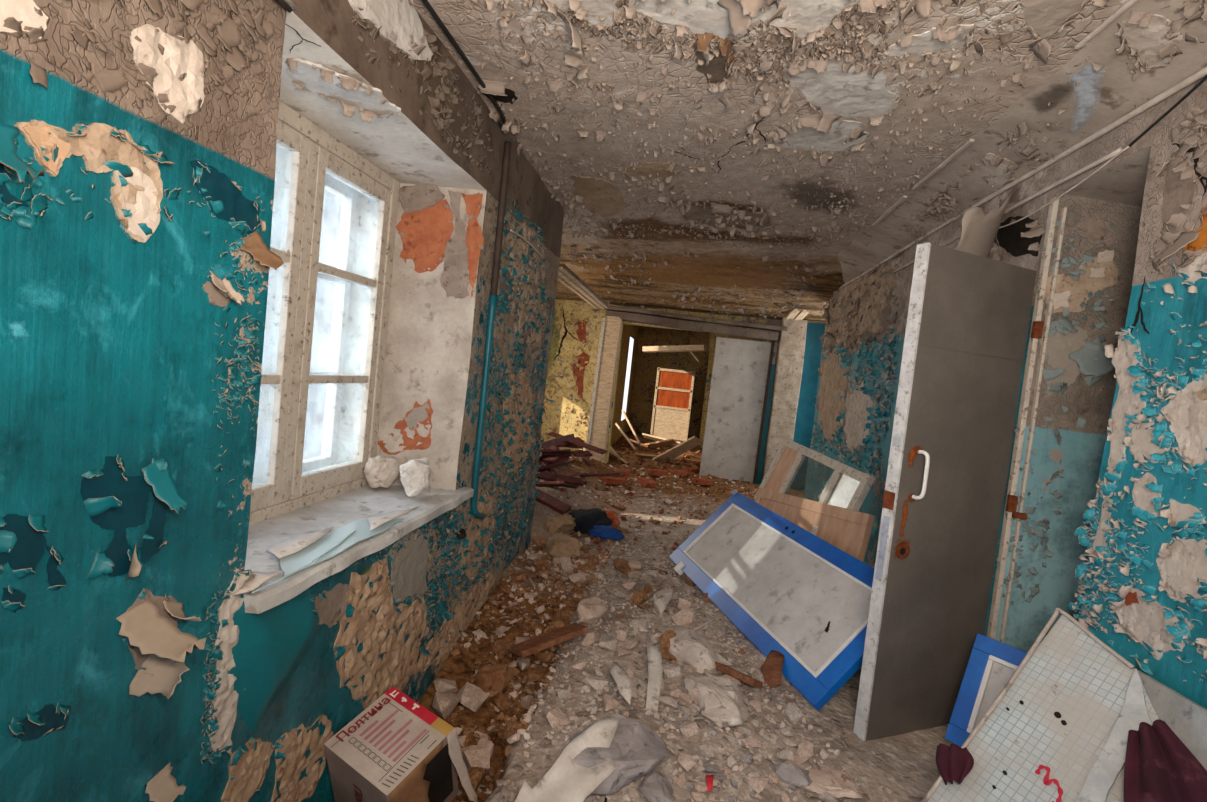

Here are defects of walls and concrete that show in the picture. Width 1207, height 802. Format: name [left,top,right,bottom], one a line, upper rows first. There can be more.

peeling [29,56,56,89]
leakage [585,219,814,303]
leakage [684,201,761,212]
spalling [0,120,334,802]
peeling [544,621,654,732]
peeling [718,653,792,771]